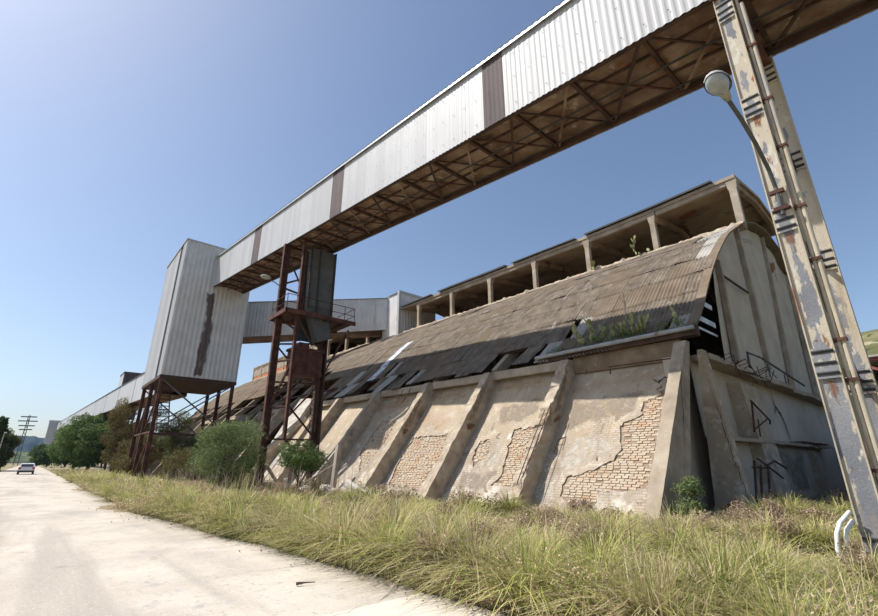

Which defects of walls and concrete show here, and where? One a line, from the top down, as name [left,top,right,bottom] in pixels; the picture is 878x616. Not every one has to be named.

spalling [354,415,402,477]
spalling [385,429,454,499]
spalling [466,403,551,497]
spalling [551,380,667,517]